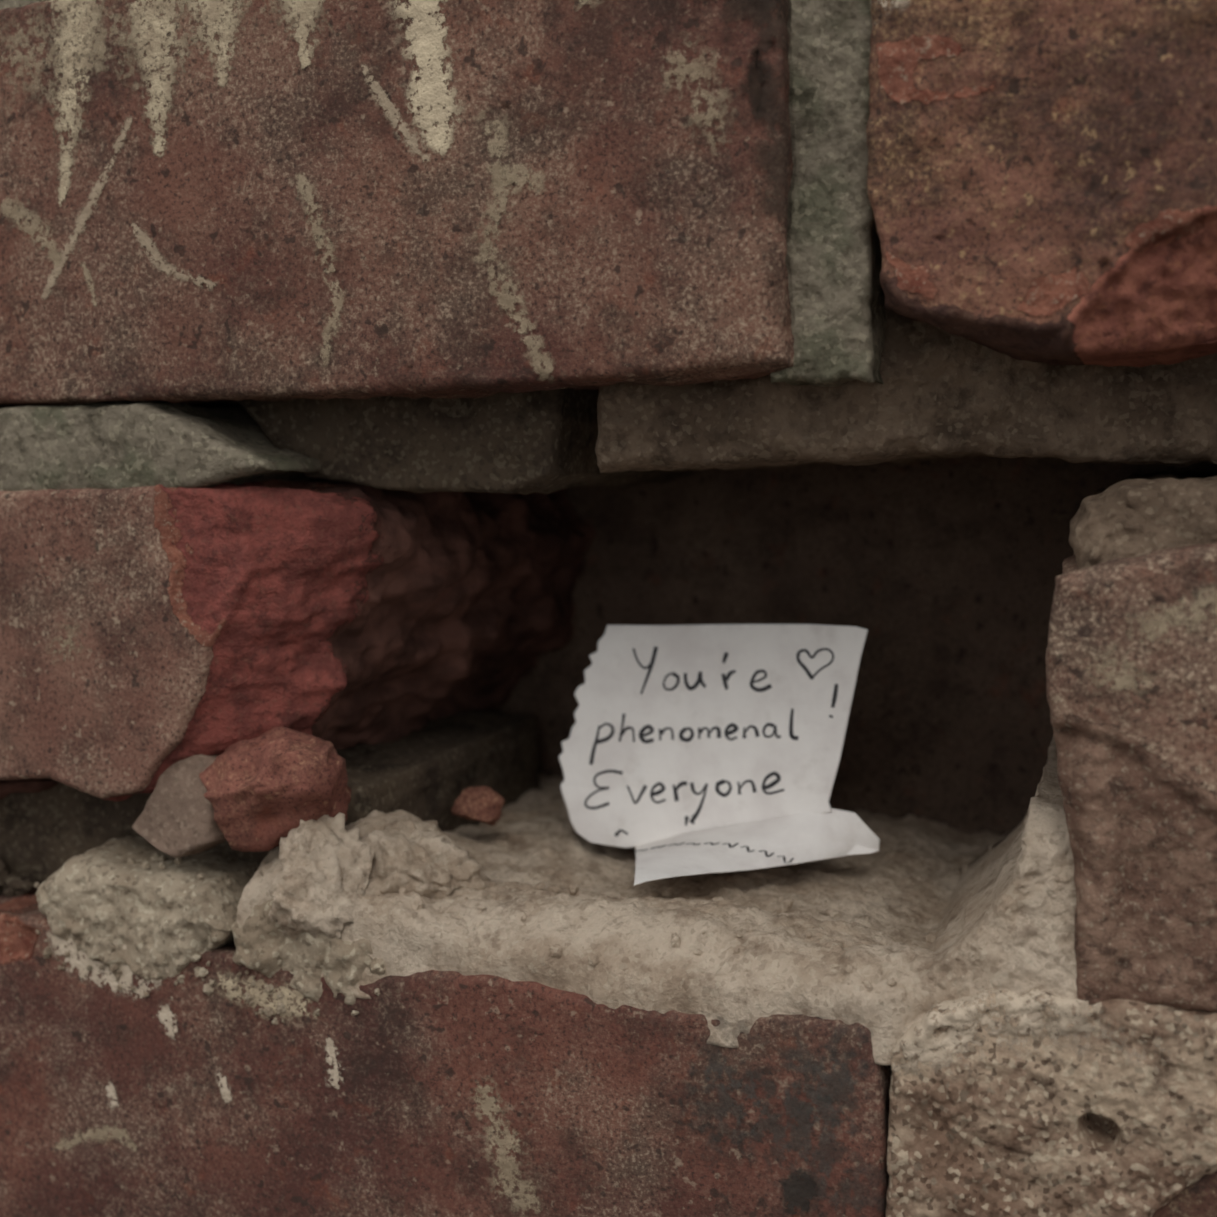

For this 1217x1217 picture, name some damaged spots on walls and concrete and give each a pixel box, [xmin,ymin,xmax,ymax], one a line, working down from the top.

peeling [876,34,996,105]
spalling [880,206,1217,367]
spalling [257,480,337,493]
spalling [153,484,229,647]
peeling [780,1168,816,1216]